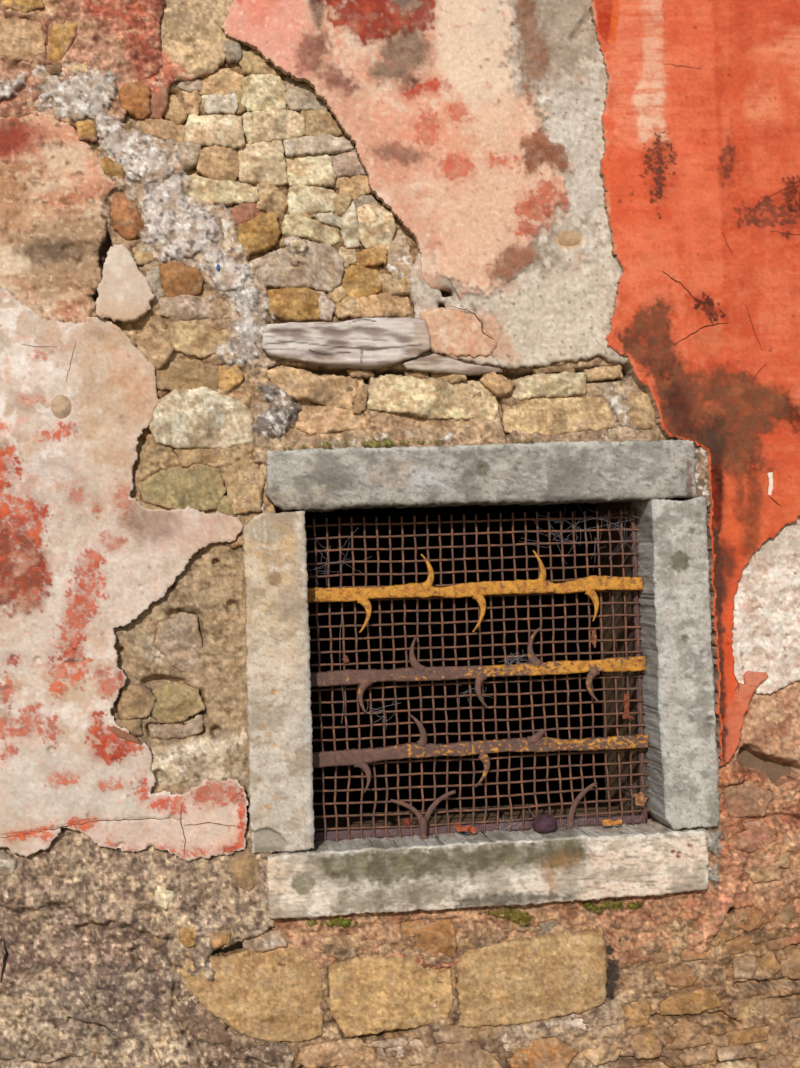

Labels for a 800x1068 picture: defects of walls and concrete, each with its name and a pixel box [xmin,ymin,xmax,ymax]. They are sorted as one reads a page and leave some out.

flaking render [0,0,675,798]
damp [640,132,677,219]
damp [618,299,800,761]
damp [694,293,725,321]
damp [738,176,800,238]
flaking render [0,517,800,1068]